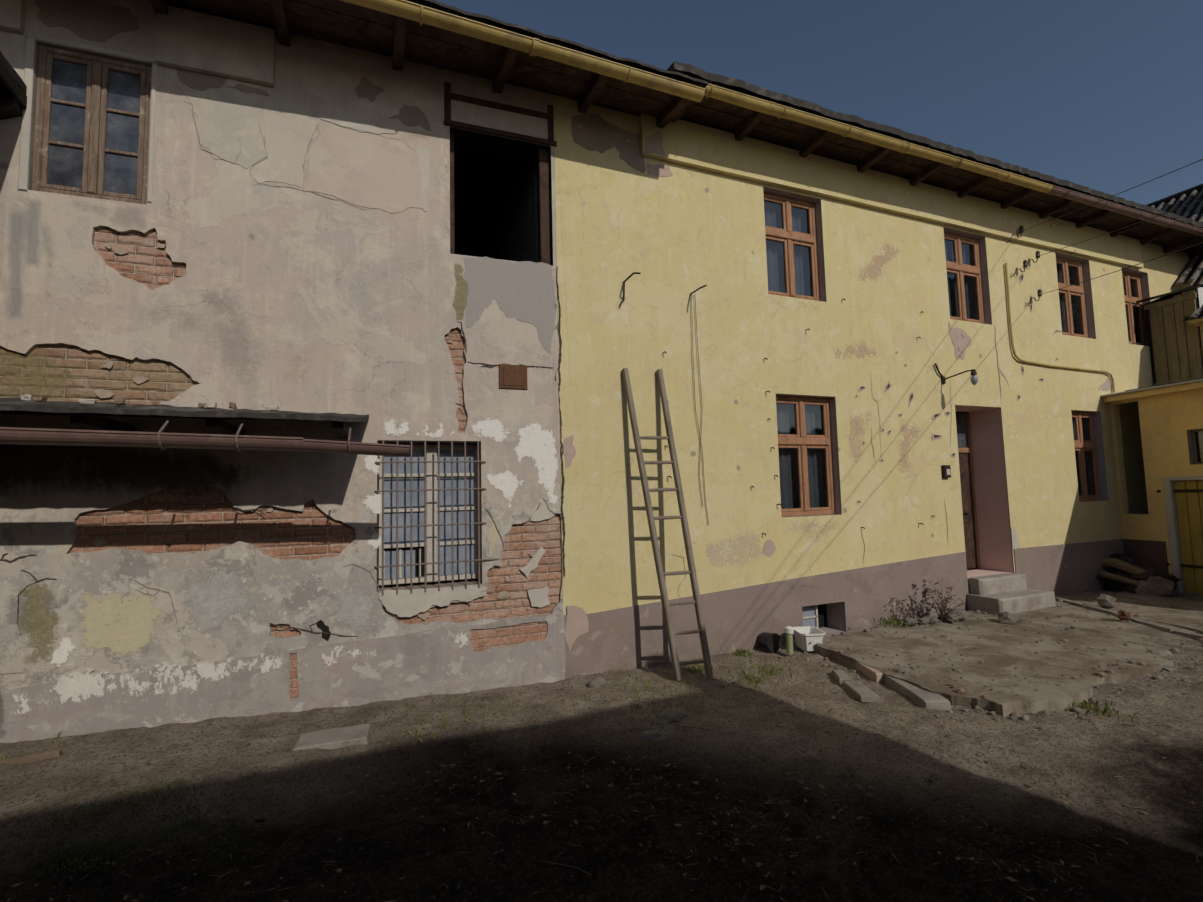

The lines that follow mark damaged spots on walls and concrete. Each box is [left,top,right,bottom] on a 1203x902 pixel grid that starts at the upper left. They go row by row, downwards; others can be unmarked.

crack [182,91,414,210]
flaking render [94,227,186,290]
flaking render [0,344,200,405]
flaking render [444,328,467,433]
flaking render [69,486,356,560]
crack [0,553,57,631]
leakage [20,585,59,662]
flaking render [270,624,301,637]
spalling [316,620,331,641]
flaking render [378,498,589,651]
flaking render [290,652,299,700]